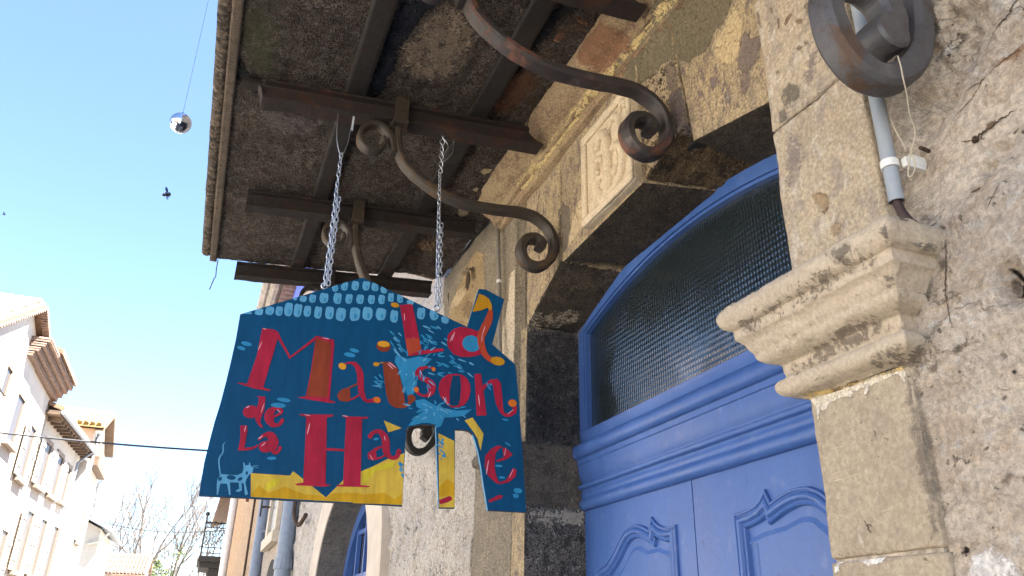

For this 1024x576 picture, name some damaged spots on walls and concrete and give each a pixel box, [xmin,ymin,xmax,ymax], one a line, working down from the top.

crack [998,0,1024,26]
crack [956,50,1020,116]
crack [961,111,1013,143]
crack [943,241,953,328]
peeling [800,367,906,420]